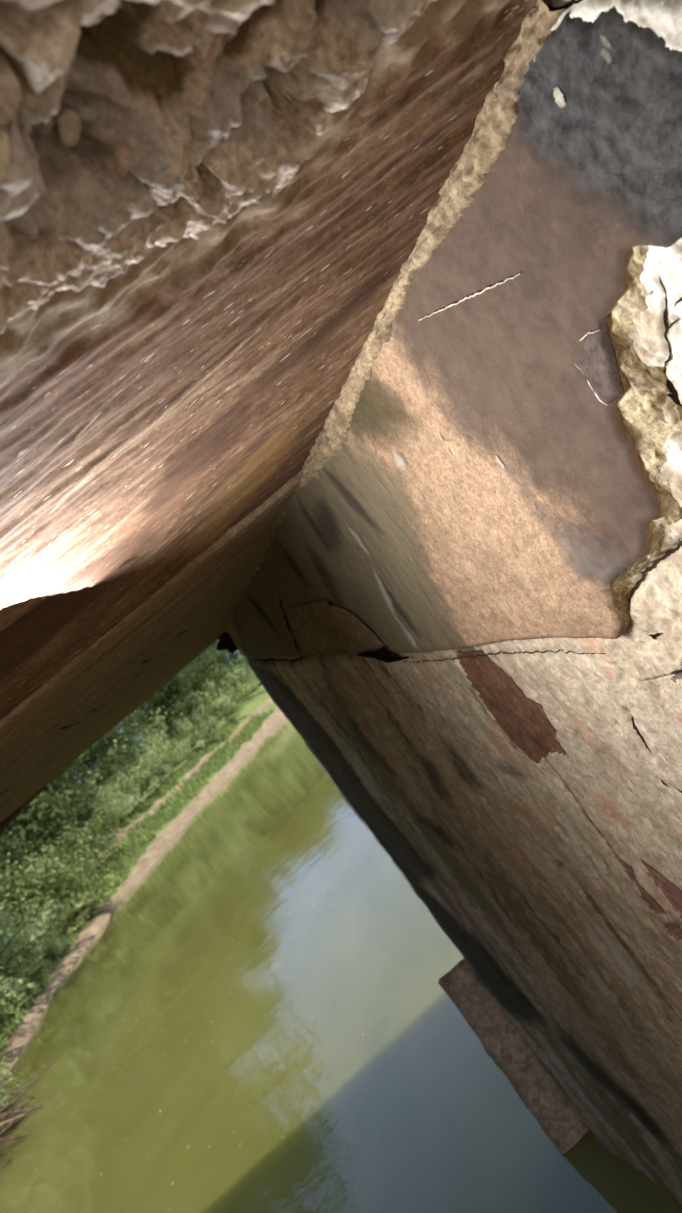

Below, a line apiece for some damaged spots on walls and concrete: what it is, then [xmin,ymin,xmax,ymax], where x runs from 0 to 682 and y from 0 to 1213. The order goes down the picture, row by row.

crack [542,0,583,13]
peeling [553,86,566,108]
crack [658,273,682,406]
spalling [610,245,682,624]
crack [628,537,682,602]
crack [248,598,315,663]
crack [404,650,606,663]